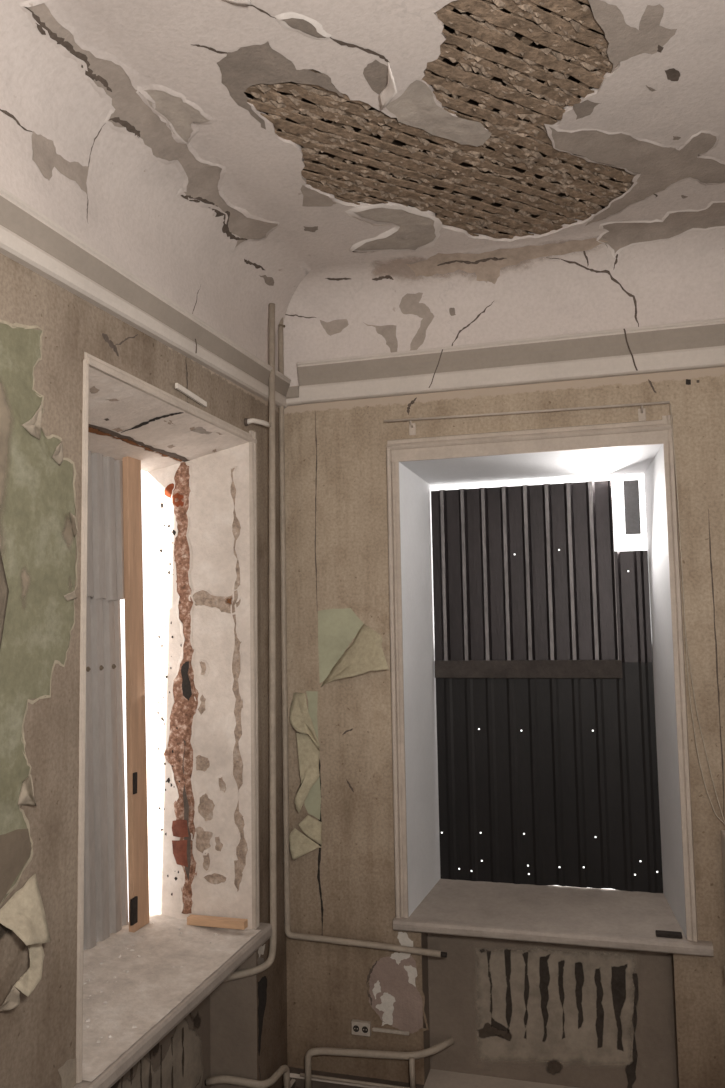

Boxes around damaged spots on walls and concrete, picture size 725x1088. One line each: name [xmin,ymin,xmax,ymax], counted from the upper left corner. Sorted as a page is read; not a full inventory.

peeling [18,0,280,286]
flaking render [193,0,725,284]
crack [121,289,200,433]
crack [407,301,494,415]
crack [546,243,656,393]
spalling [157,462,249,916]
flaking render [0,829,32,903]
peeling [366,932,429,1037]